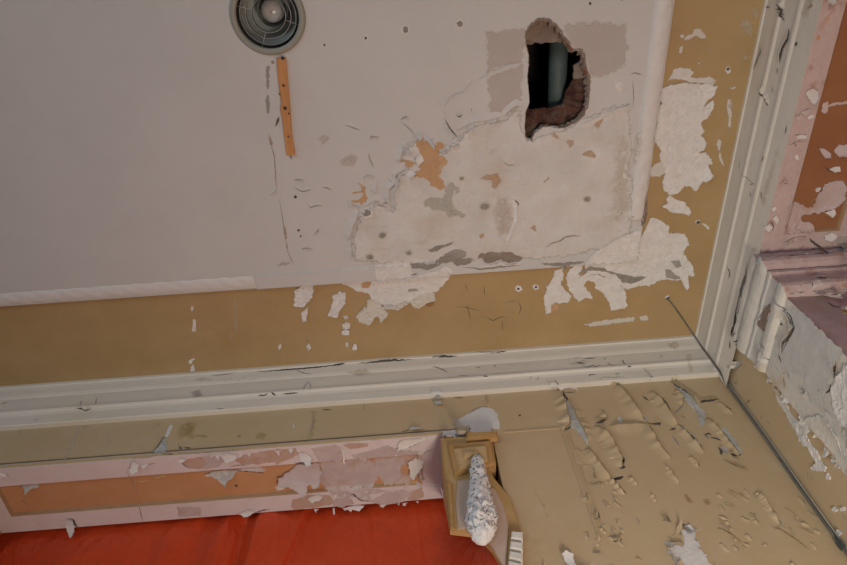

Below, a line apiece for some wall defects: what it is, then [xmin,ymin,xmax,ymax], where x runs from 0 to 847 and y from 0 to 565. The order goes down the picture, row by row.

peeling [340,17,648,276]
peeling [702,165,714,183]
peeling [764,144,847,257]
peeling [796,88,819,120]
spalling [356,292,435,325]
peeling [177,427,443,515]
peeling [443,394,500,438]
peeling [529,377,636,492]
peeling [644,355,749,470]
peeling [752,301,847,481]
peeling [562,550,576,565]
peeling [660,511,712,565]